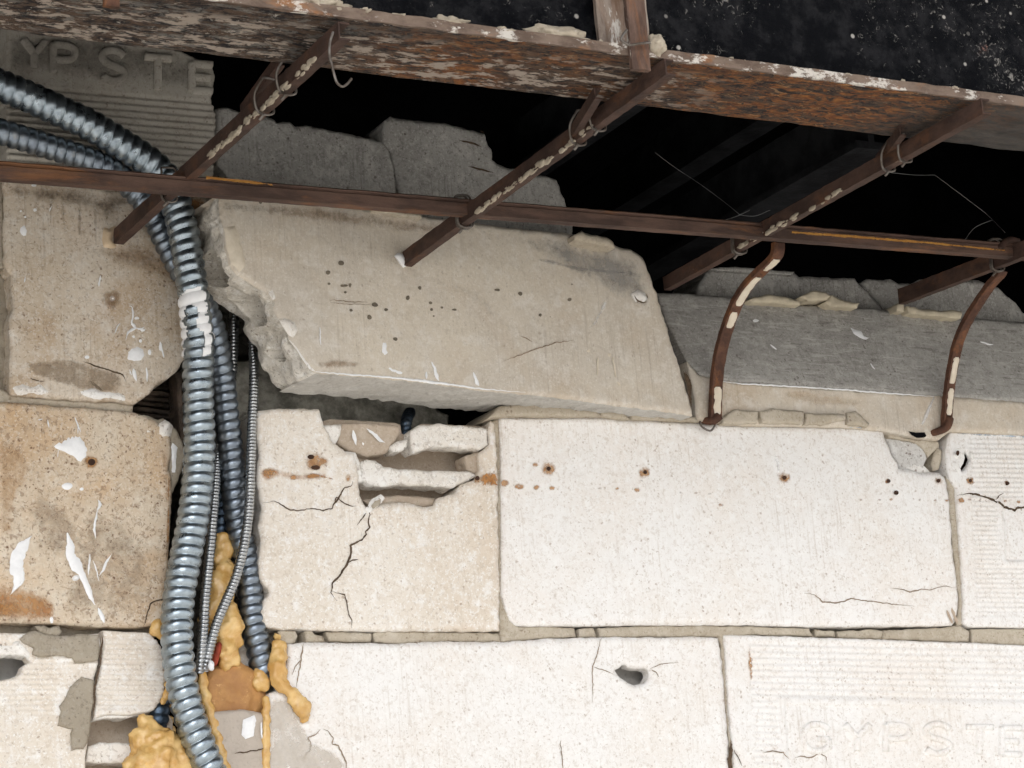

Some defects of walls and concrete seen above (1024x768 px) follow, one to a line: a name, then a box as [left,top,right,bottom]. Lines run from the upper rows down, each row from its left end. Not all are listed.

corrosion [206,176,272,185]
corrosion [792,231,1005,251]
spalling [323,419,488,513]
crack [957,493,1024,512]
crack [264,482,370,626]
crack [805,586,952,606]
spalling [0,641,30,660]
crack [592,644,613,701]